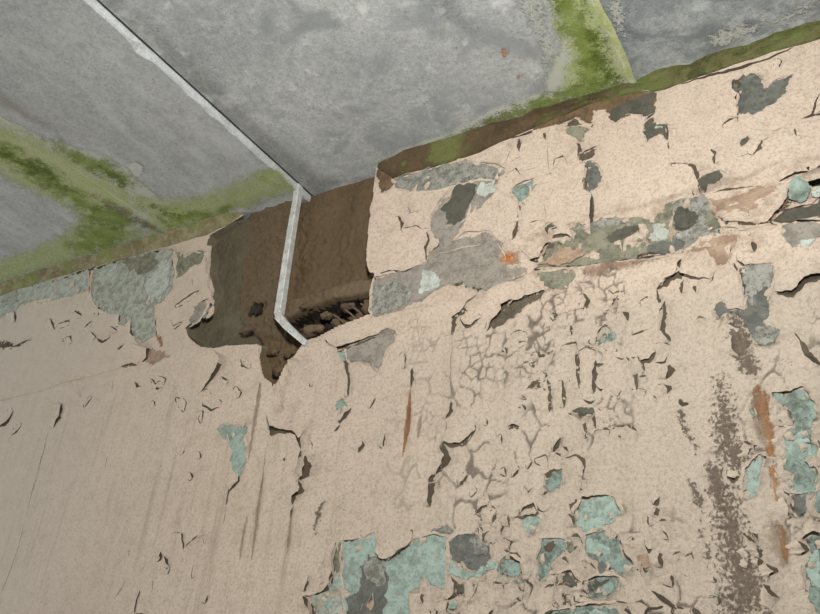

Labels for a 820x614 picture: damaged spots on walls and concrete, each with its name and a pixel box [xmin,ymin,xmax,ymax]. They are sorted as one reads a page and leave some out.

damp [462,0,628,132]
peeling [512,90,692,196]
peeling [697,70,794,164]
damp [0,125,294,281]
rust [402,391,411,456]
spalling [0,143,820,614]
rust [752,384,779,502]
rust [779,525,788,563]